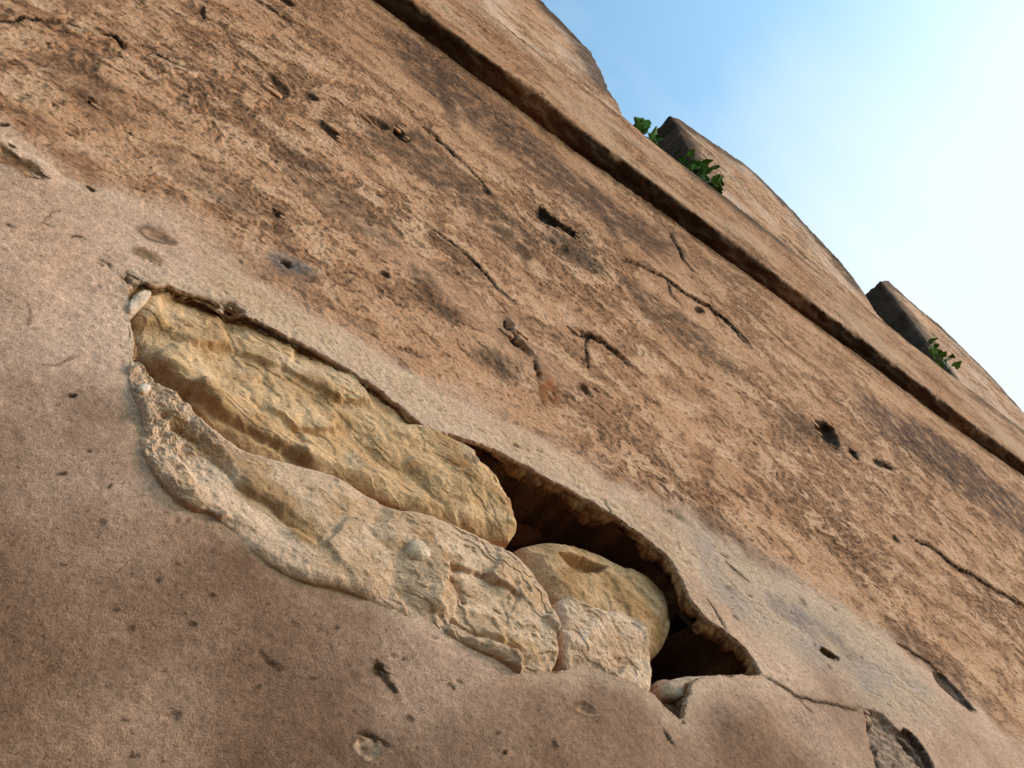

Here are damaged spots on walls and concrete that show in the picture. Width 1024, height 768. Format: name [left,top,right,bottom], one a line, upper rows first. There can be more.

crack [620,234,747,343]
crack [566,325,627,368]
spalling [125,279,763,723]
crack [915,540,1024,607]
crack [765,677,858,711]
spalling [862,708,924,768]